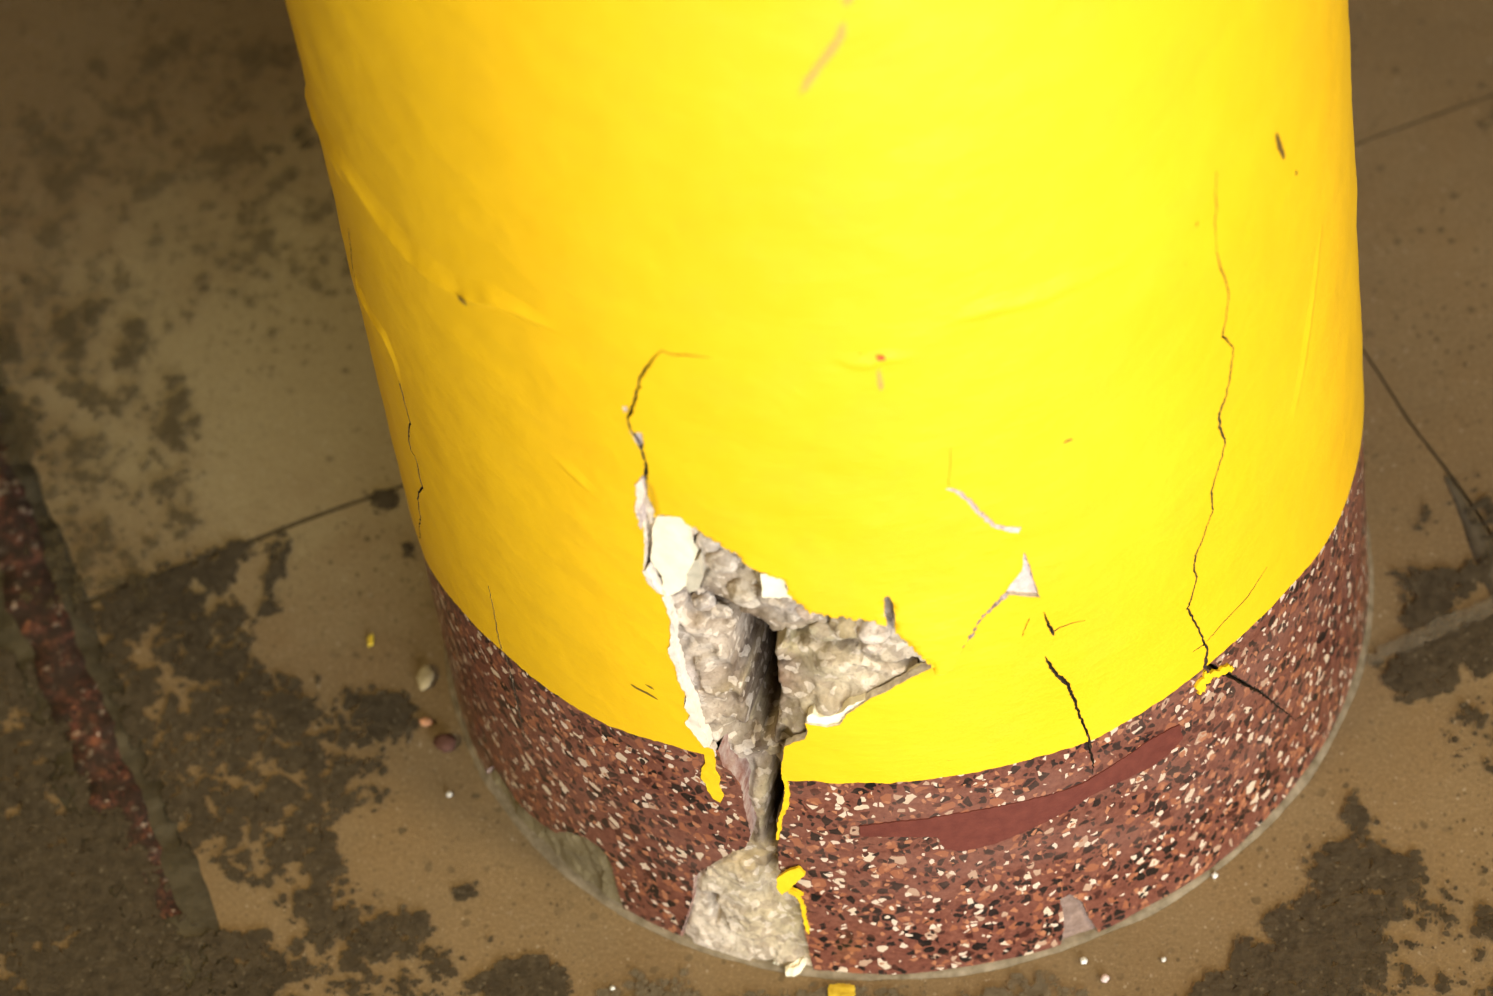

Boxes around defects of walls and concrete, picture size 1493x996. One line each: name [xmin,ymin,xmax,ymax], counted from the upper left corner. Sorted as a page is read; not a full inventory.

crack [399,383,423,538]
crack [623,350,711,481]
crack [1186,173,1296,721]
spalling [635,476,1038,977]
crack [1022,612,1094,773]